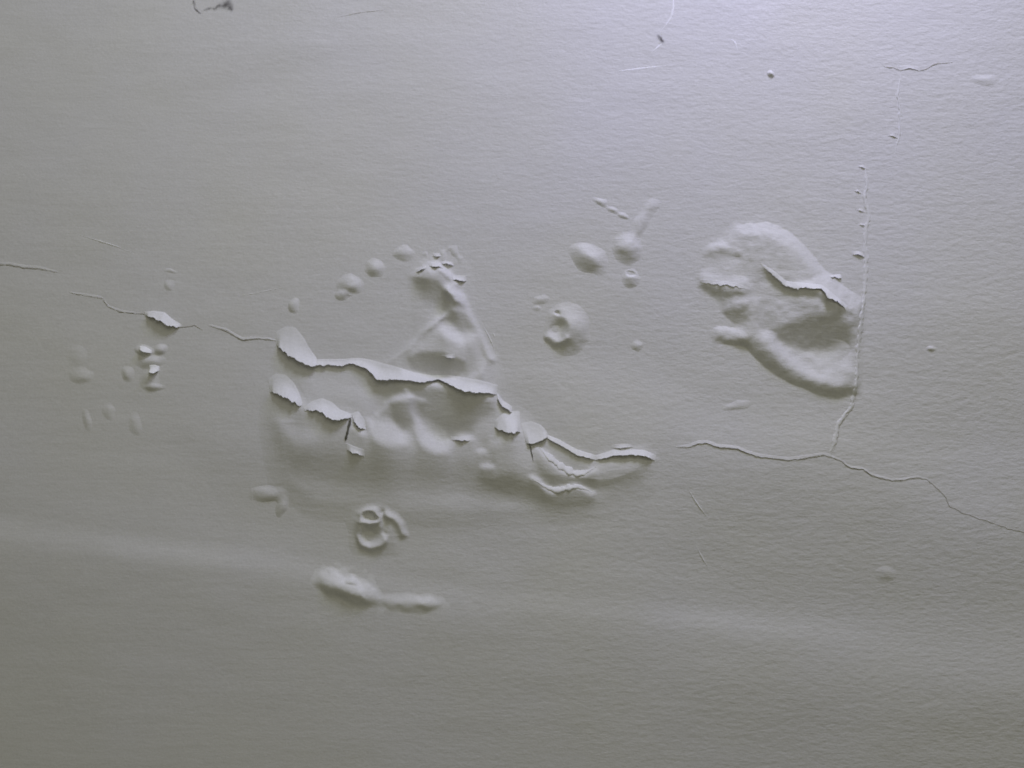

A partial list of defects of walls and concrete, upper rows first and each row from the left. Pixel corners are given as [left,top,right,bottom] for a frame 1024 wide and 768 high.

crack [887,62,953,151]
crack [0,262,276,341]
peeling [257,251,662,528]
crack [676,165,1024,533]